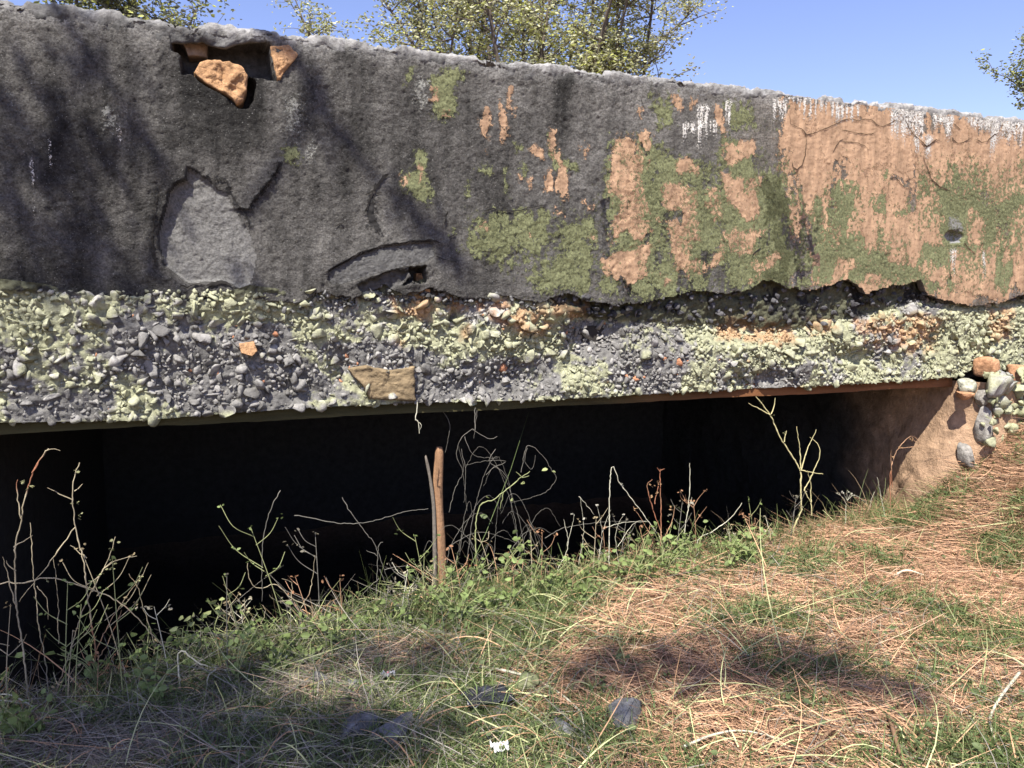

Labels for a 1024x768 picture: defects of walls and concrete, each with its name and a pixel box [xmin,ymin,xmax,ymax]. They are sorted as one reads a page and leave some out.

spalling [172,43,298,109]
flaking render [478,85,518,152]
flaking render [670,93,699,112]
water stain [682,99,732,153]
water stain [772,96,859,123]
crack [790,119,998,191]
water stain [890,109,1024,160]
crack [365,174,389,212]
crack [320,212,456,278]
spalling [0,96,1024,427]